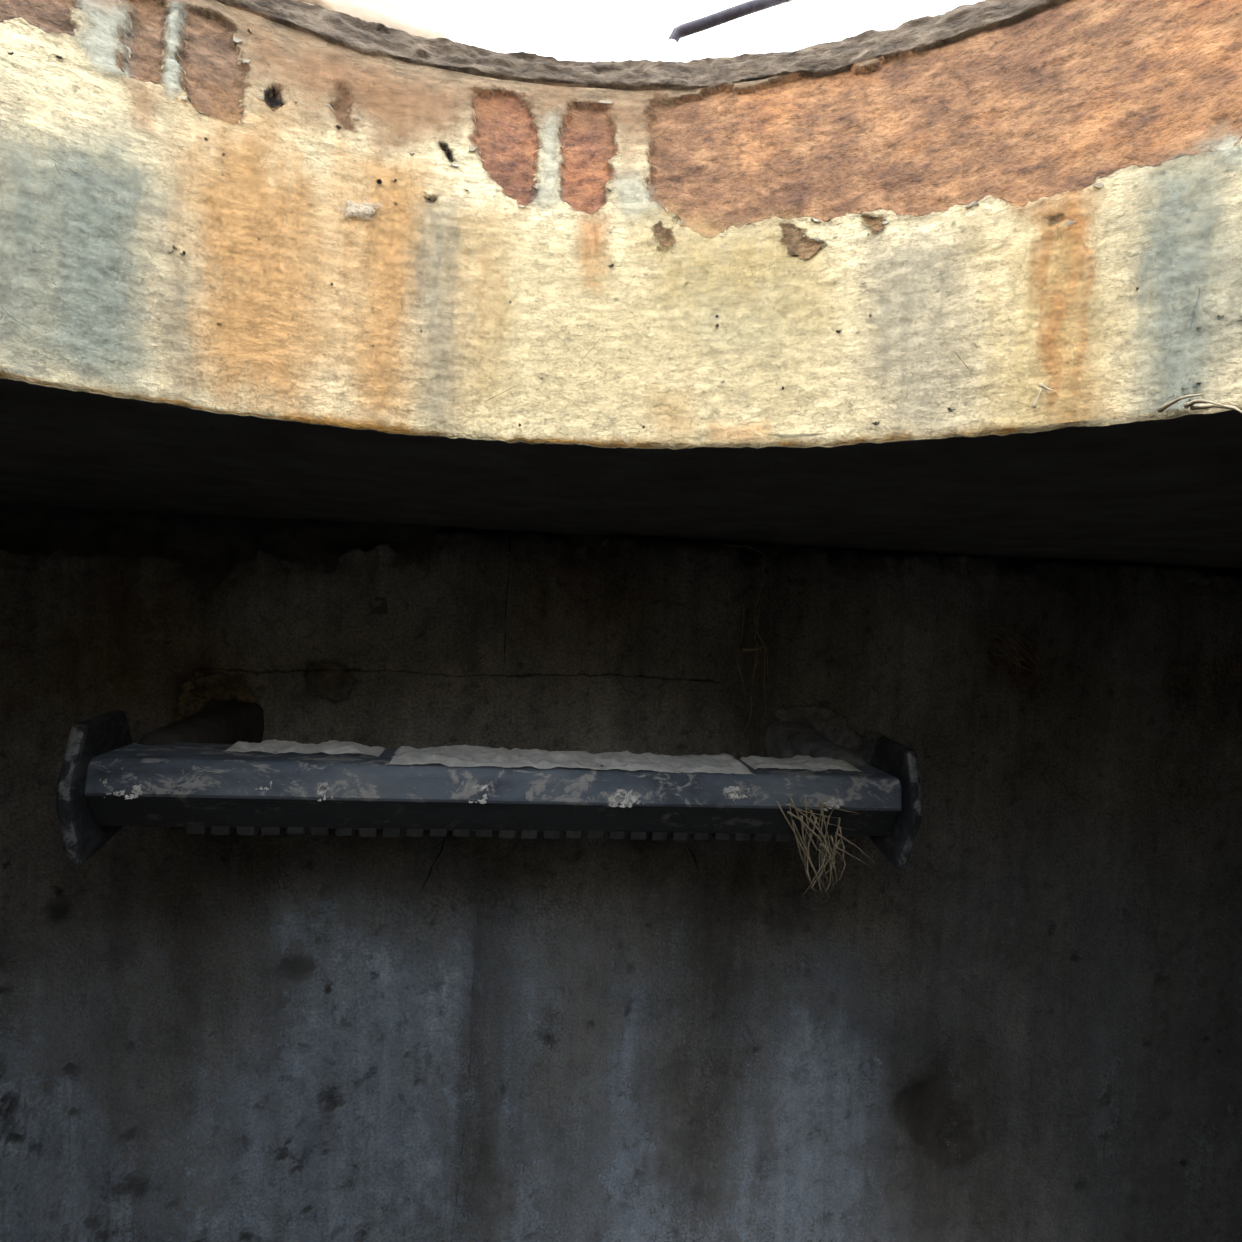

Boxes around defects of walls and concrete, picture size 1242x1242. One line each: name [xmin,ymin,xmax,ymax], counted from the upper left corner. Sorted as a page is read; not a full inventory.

peeling [0,0,83,36]
peeling [116,0,298,125]
spalling [439,141,459,167]
peeling [469,88,618,214]
peeling [645,0,1242,262]